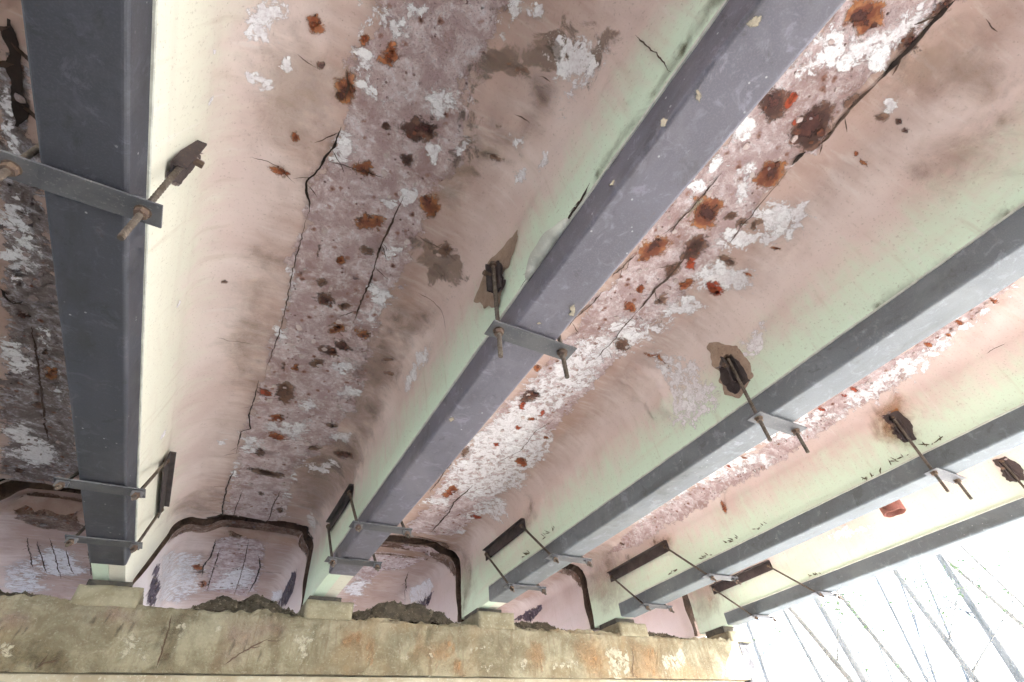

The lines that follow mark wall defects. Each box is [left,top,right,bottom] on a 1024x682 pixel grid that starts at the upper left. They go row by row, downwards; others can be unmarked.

damp [419,0,618,165]
corrosion [758,87,860,152]
crack [731,0,955,241]
corrosion [844,0,887,41]
spalling [0,178,84,532]
crack [210,128,386,516]
spalling [168,0,511,607]
damp [381,237,469,286]
damp [423,111,816,534]
spalling [352,0,945,612]
crack [595,174,721,363]
corrosion [637,195,763,305]